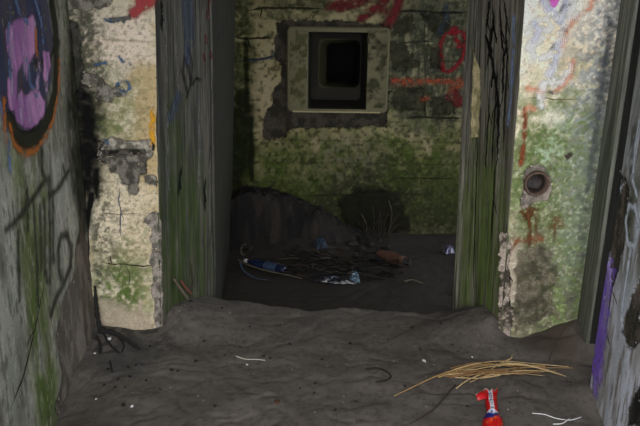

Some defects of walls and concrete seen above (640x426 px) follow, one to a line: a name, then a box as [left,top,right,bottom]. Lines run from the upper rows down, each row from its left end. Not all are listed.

peeling [69,20,127,103]
spalling [262,12,456,141]
water stain [71,72,99,243]
flaking render [98,137,157,195]
flaking render [144,210,163,327]
crack [472,0,510,300]
peeling [498,232,558,337]
corrosion [513,206,544,248]
spalling [520,164,553,209]